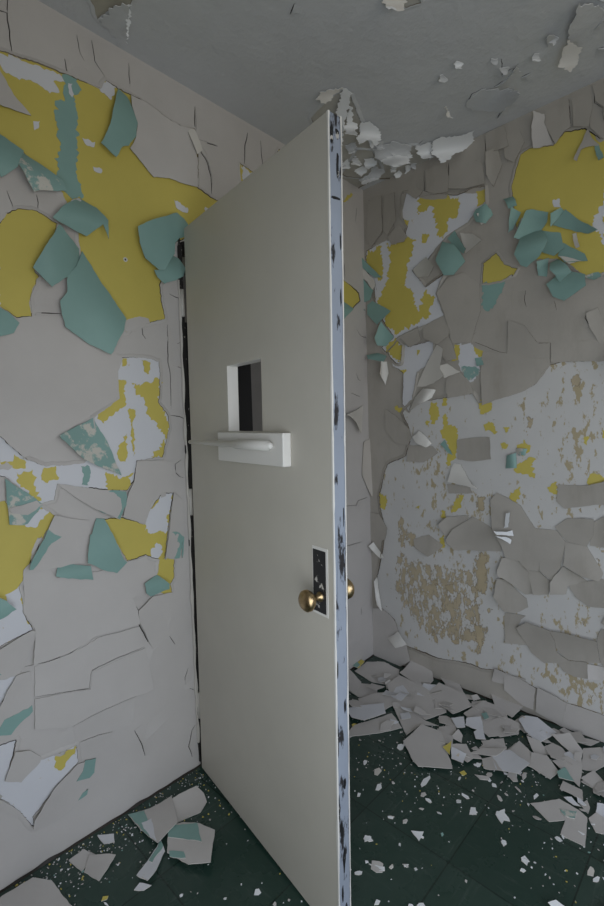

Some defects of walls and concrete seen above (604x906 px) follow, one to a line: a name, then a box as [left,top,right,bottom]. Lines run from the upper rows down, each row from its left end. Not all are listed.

peeling [0,47,219,831]